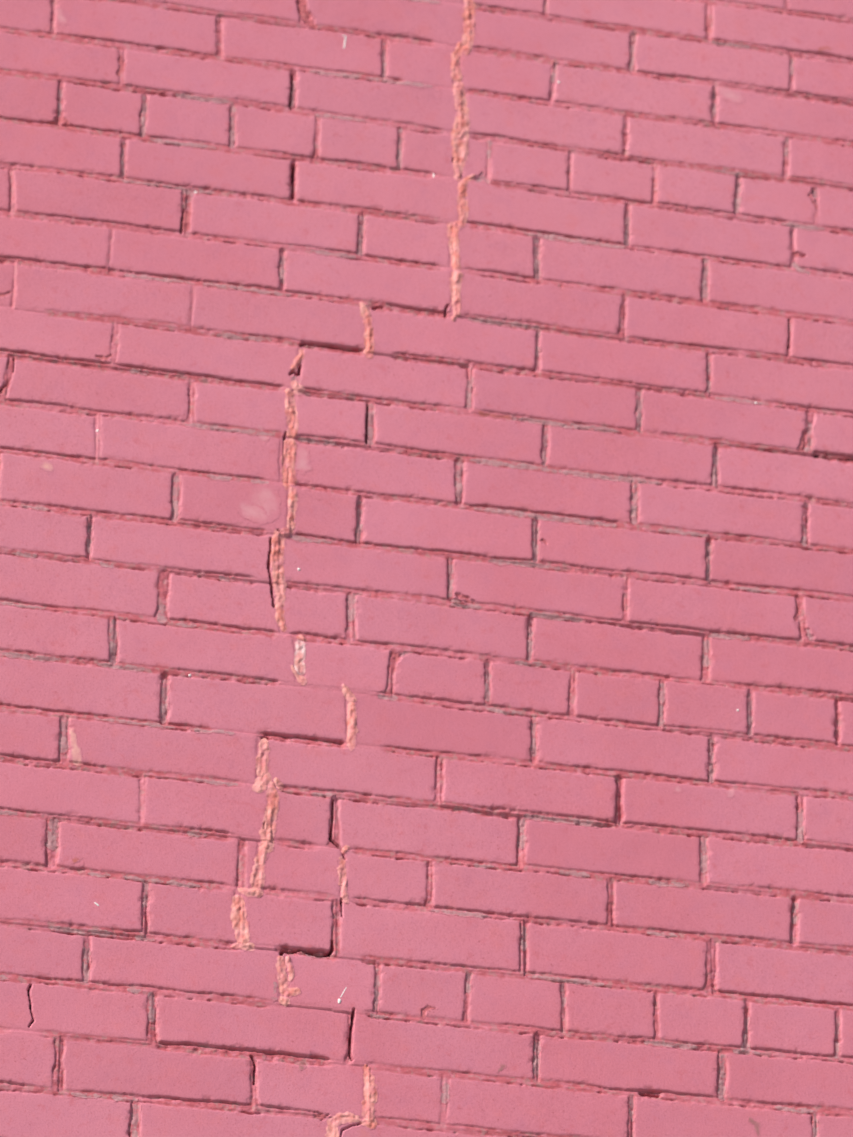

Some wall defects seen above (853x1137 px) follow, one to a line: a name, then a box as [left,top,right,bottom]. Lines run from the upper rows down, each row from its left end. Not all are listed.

crack [444,0,477,322]
crack [358,301,375,360]
crack [267,348,308,686]
crack [341,683,359,752]
crack [230,737,302,1007]
crack [329,816,352,905]
crack [324,1014,378,1137]